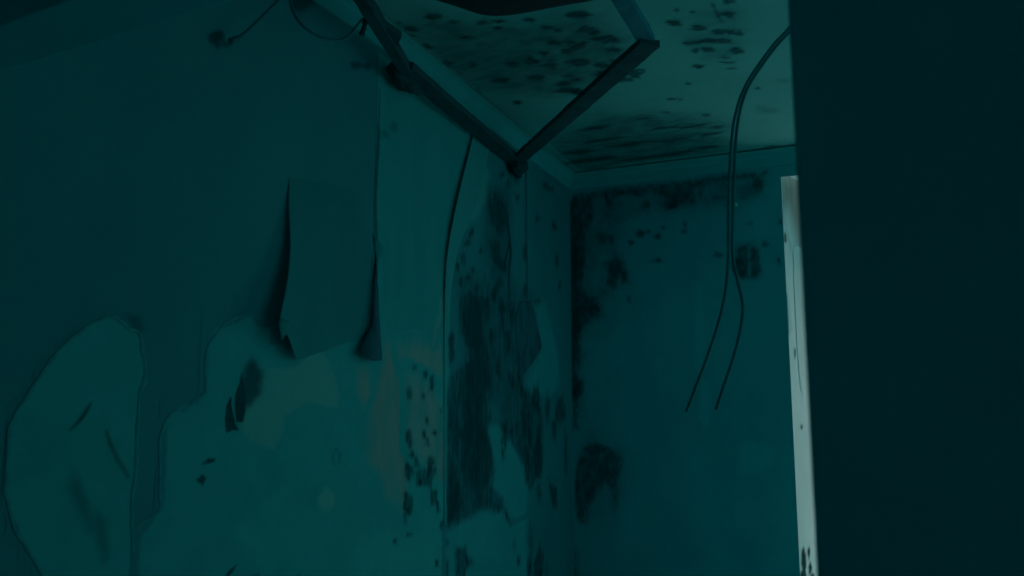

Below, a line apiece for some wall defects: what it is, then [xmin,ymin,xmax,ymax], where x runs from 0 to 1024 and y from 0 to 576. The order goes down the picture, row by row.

leakage [496,12,618,95]
leakage [450,138,472,233]
spalling [225,363,261,433]
leakage [406,153,598,576]